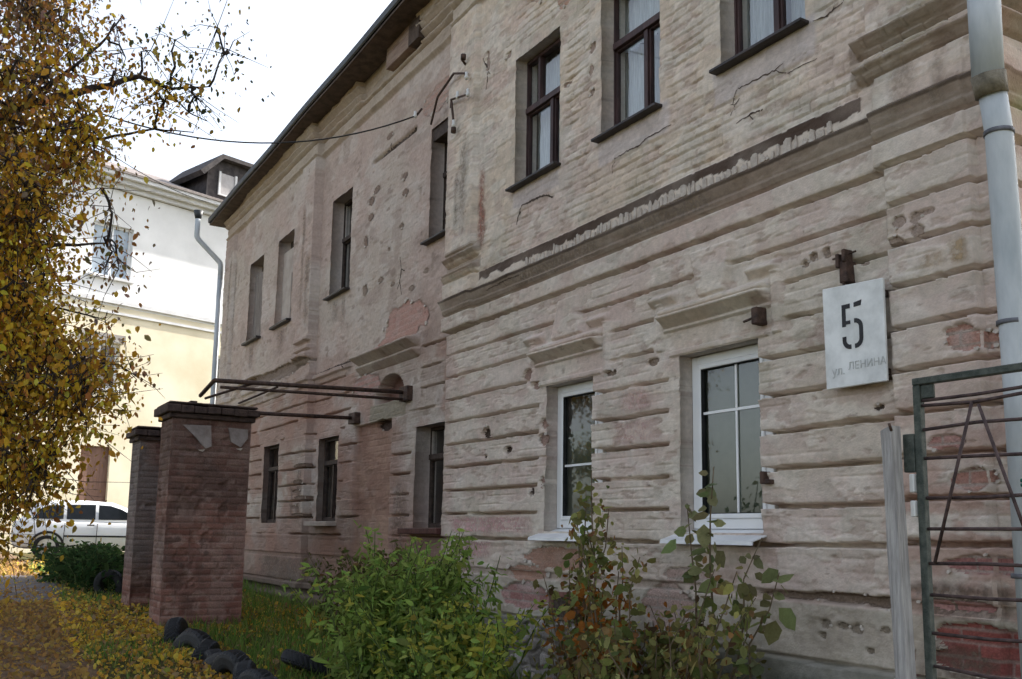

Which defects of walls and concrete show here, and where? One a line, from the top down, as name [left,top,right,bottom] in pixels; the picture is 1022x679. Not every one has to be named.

crack [731,58,817,124]
crack [612,125,670,173]
crack [516,194,553,225]
spalling [889,208,935,247]
flaking render [374,285,429,349]
flaking render [943,324,1000,351]
flaking render [951,465,1001,493]
flaking render [943,553,1014,576]
flaking render [916,599,1021,679]